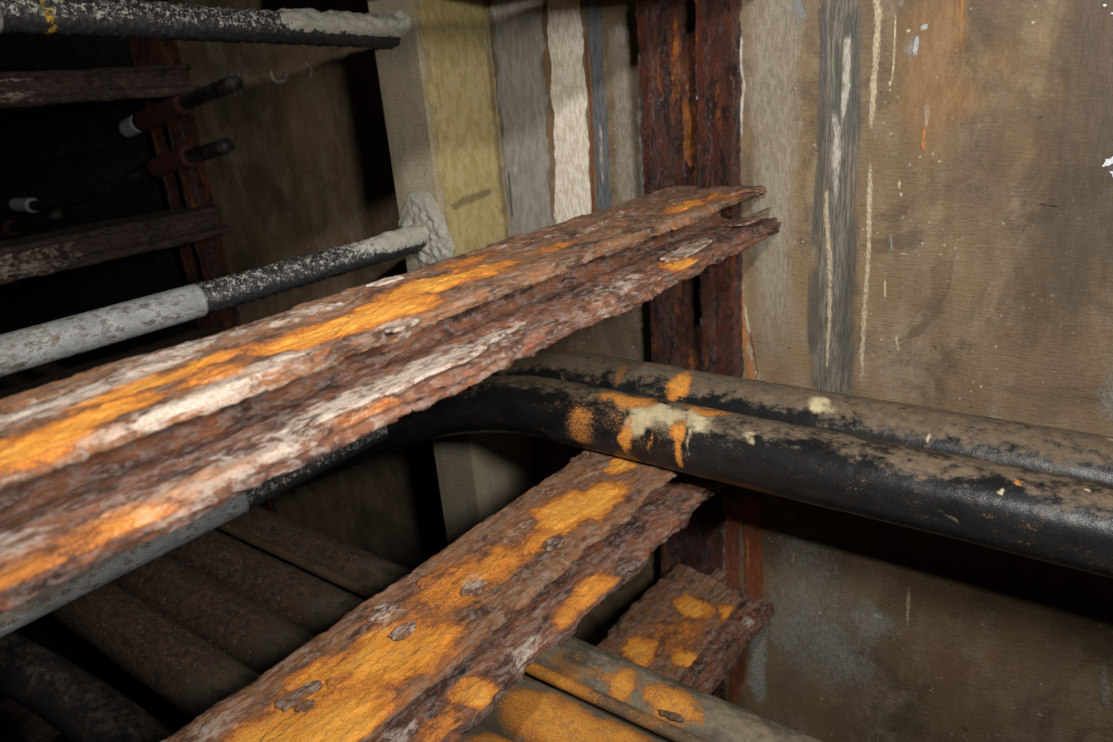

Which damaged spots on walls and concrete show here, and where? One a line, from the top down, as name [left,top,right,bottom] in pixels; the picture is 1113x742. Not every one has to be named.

leakage [792,0,903,395]
corrosion [741,287,762,381]
corrosion [723,495,763,598]